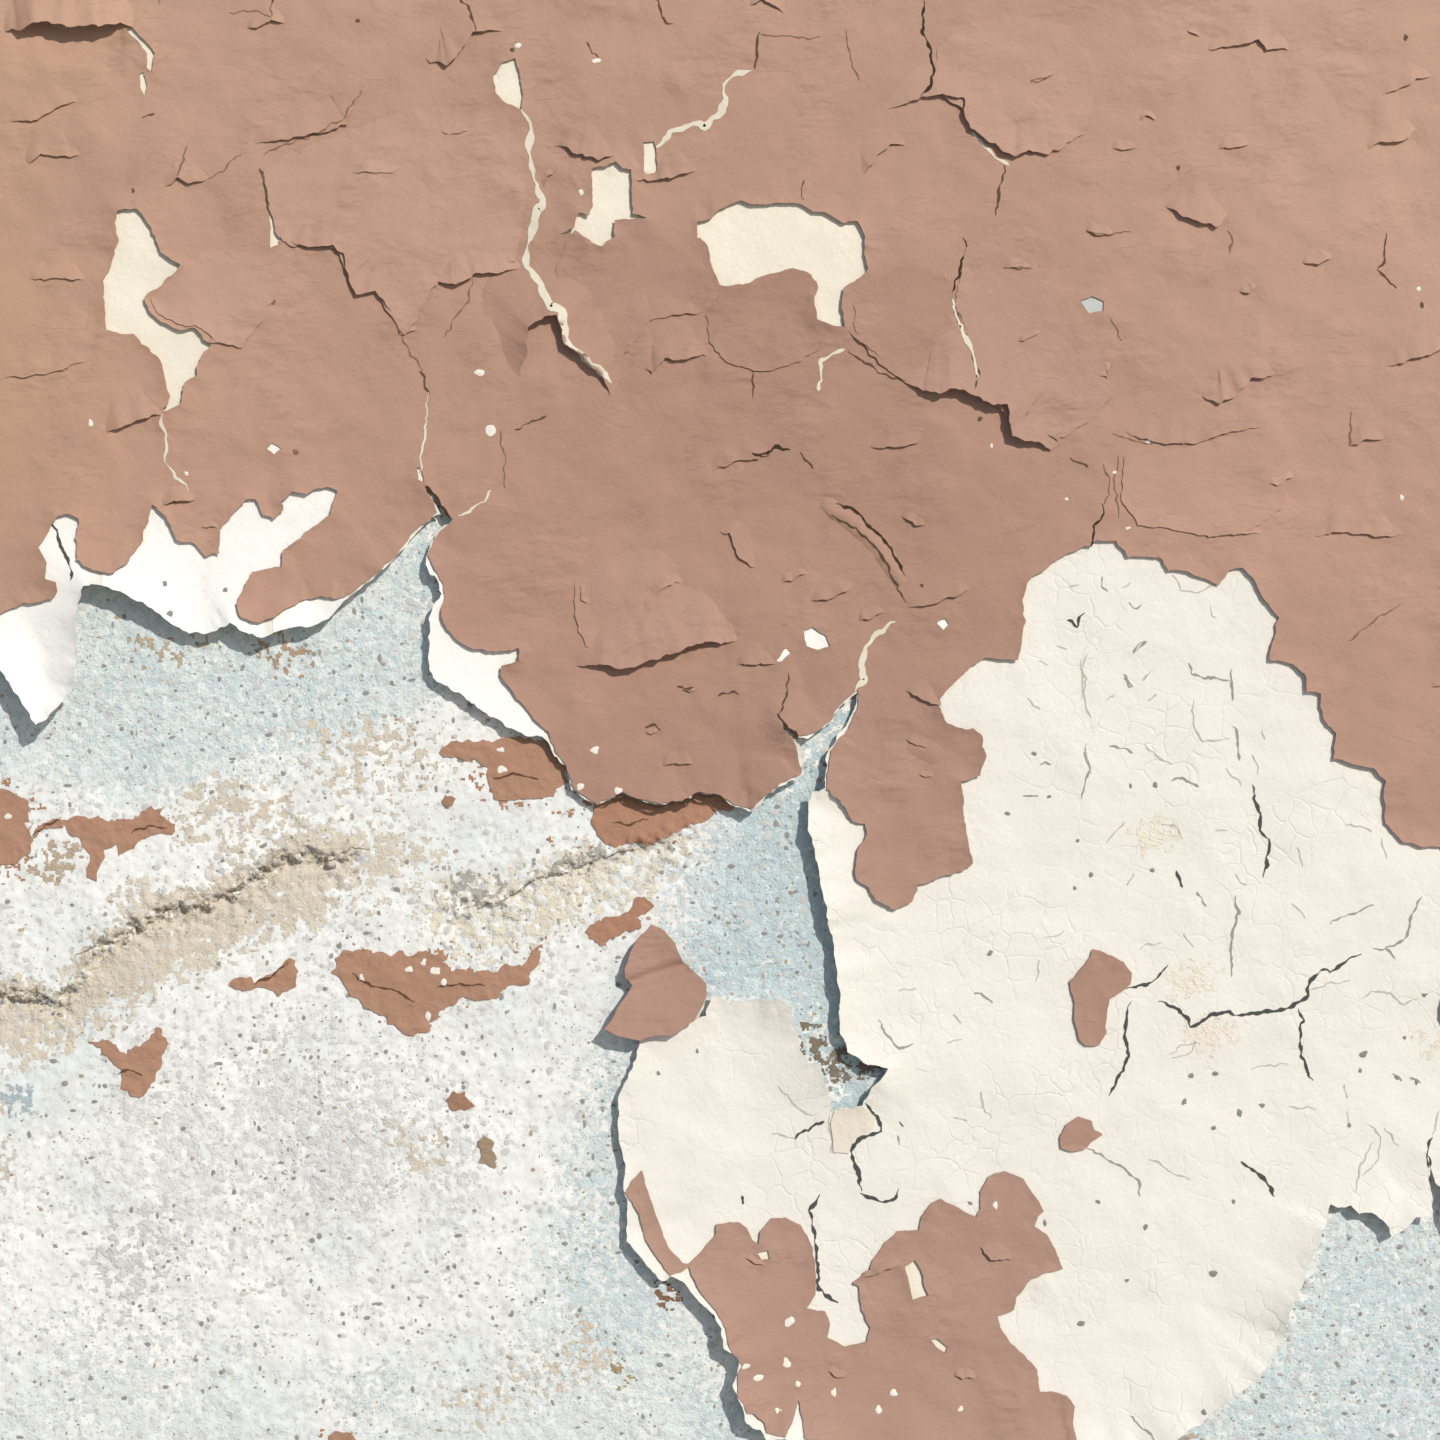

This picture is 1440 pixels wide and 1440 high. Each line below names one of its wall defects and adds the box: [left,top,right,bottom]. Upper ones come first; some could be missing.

crack [656,30,859,148]
peeling [103,209,235,432]
peeling [253,59,708,397]
crack [520,109,612,383]
peeling [711,435,773,471]
peeling [0,487,347,724]
peeling [427,559,544,738]
crack [832,503,906,692]
crack [1035,433,1439,1197]
peeling [576,540,1440,1440]
crack [808,1194,839,1303]
crack [771,1086,904,1203]